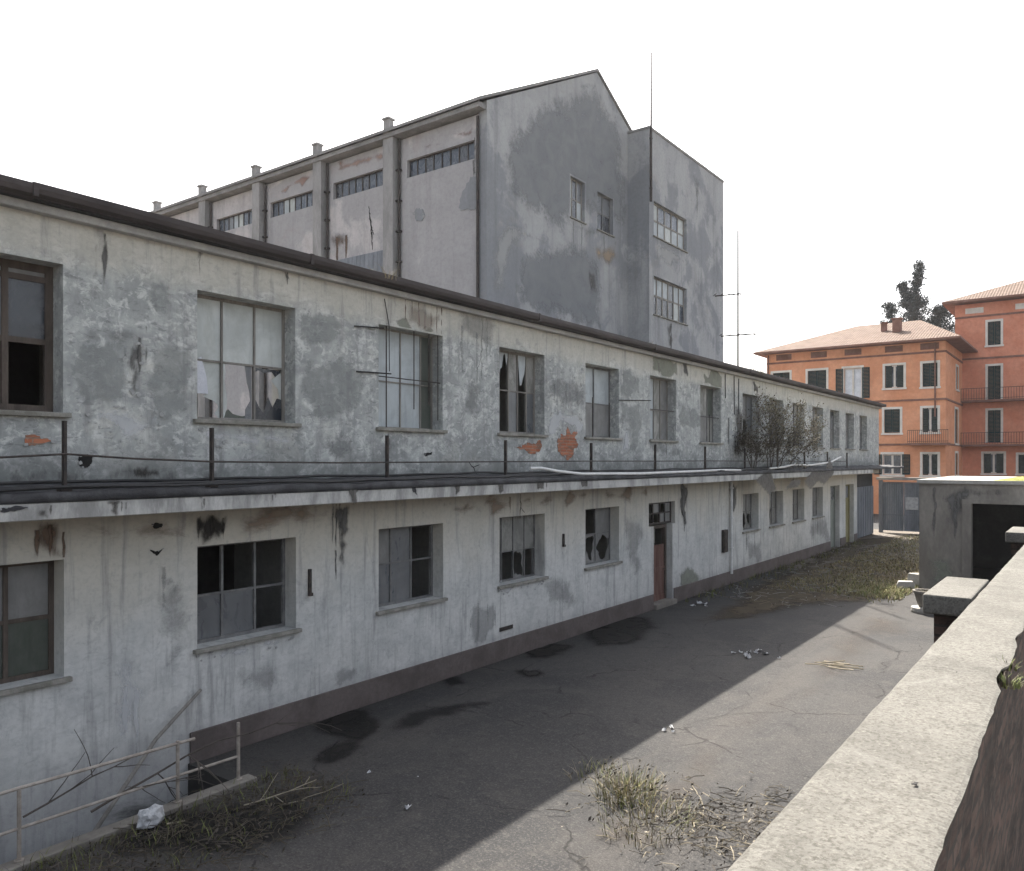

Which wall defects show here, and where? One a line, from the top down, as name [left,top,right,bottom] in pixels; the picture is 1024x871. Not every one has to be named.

corrosion [334,235,348,260]
flaking render [24,434,57,446]
flaking render [517,411,582,460]
damp [680,484,688,524]
damp [332,490,358,573]